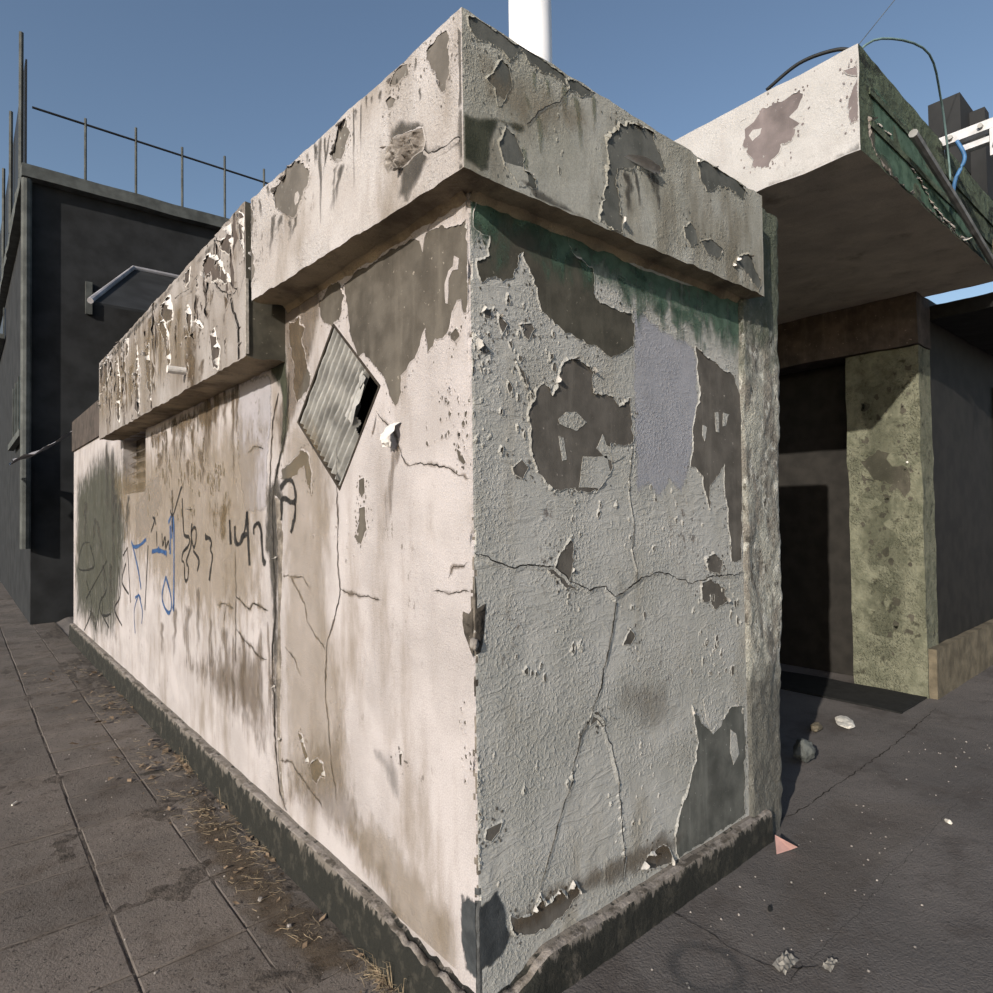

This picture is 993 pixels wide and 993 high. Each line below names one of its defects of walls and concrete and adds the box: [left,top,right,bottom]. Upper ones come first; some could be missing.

peeling [380,14,665,234]
peeling [738,85,810,173]
leakage [75,444,129,632]
leakage [151,385,239,473]
leakage [266,479,283,661]
crack [220,373,379,811]
crack [371,411,468,479]
peeling [313,202,642,612]
crack [435,445,744,891]
leakage [656,301,705,346]
peeling [639,629,748,874]
peeling [684,346,744,627]